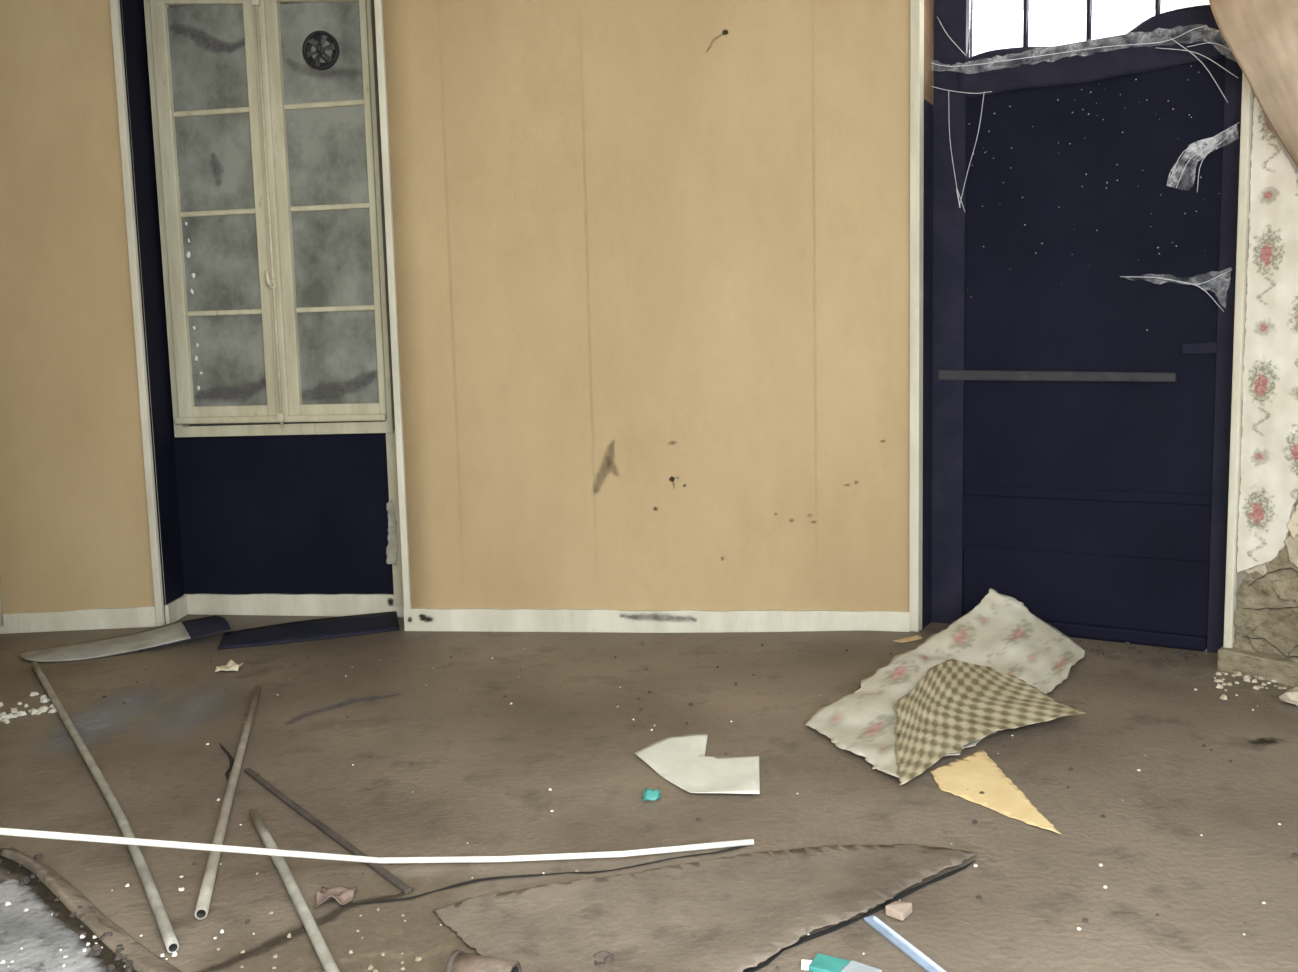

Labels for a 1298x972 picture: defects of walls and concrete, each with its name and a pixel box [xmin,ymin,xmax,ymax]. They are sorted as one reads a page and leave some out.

flaking render [1233,499,1298,662]